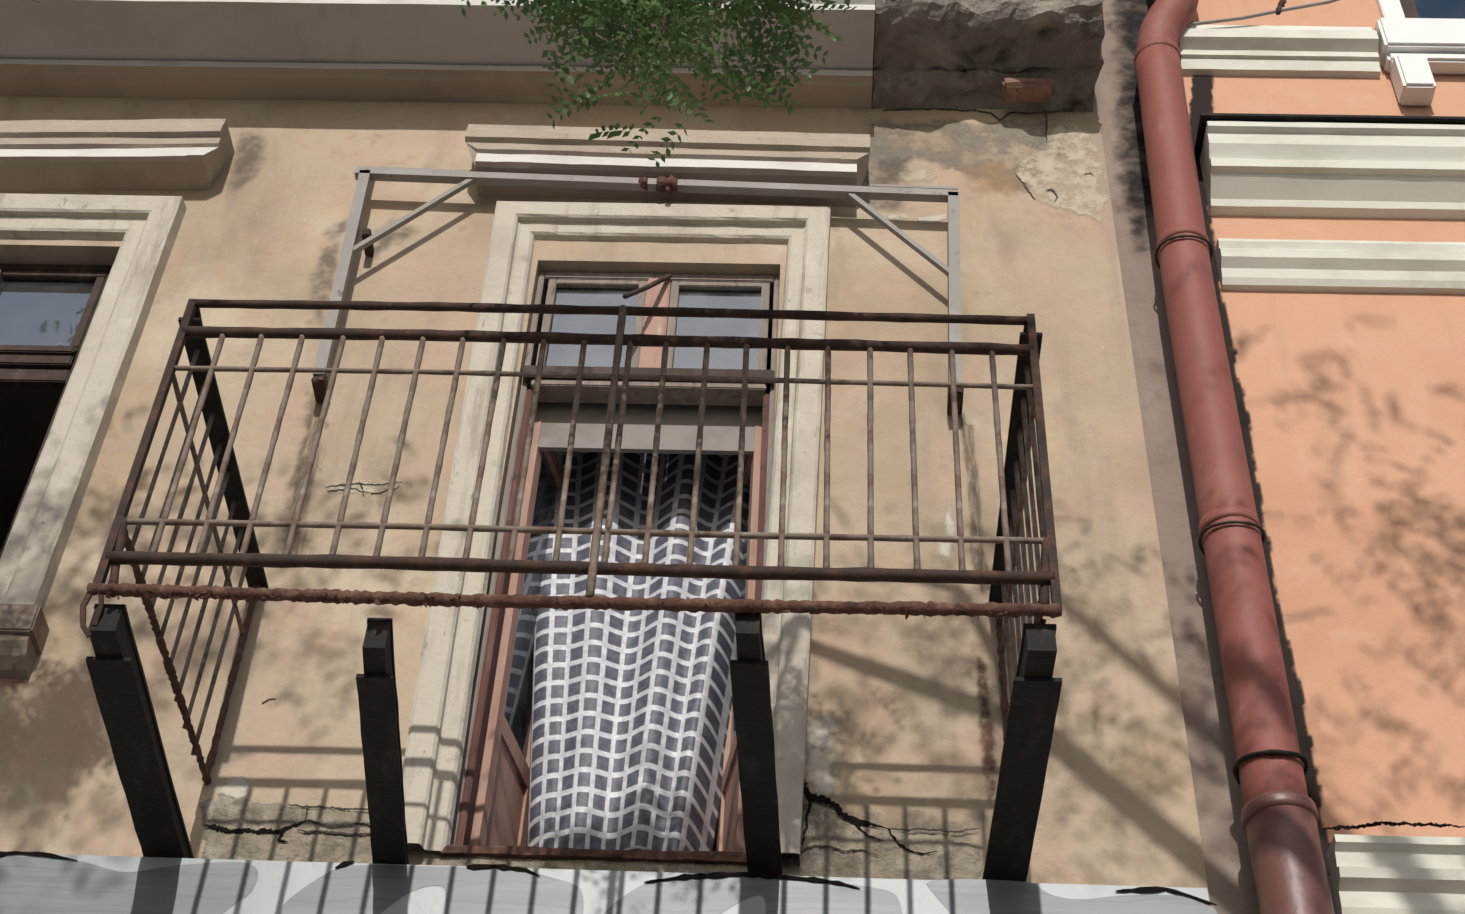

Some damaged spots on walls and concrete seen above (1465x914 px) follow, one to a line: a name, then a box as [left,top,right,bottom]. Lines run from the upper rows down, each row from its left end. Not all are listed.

flaking render [1000,77,1108,227]
flaking render [887,214,947,224]
rust [978,661,995,790]
flaking render [199,776,373,864]
flaking render [408,846,748,873]
flaking render [782,716,981,880]
crack [790,779,977,856]